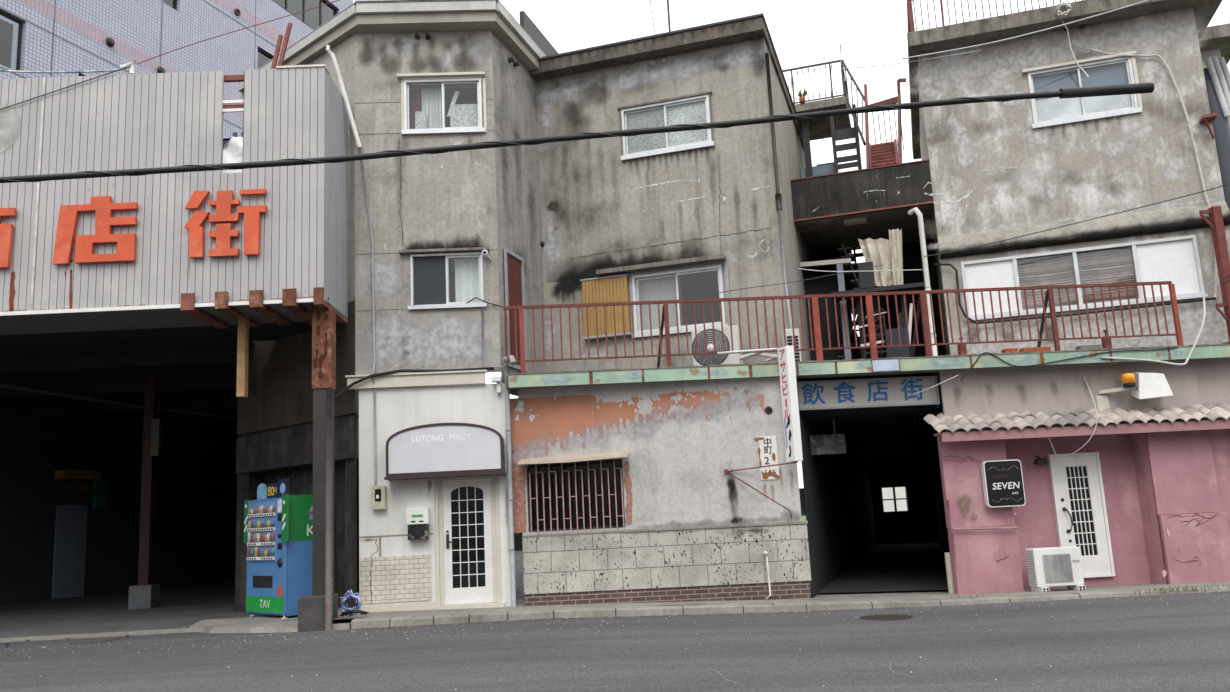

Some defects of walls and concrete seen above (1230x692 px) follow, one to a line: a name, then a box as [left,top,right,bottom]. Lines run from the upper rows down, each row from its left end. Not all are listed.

damp [361,38,479,73]
damp [545,221,560,259]
damp [554,249,703,297]
rust [313,297,329,379]
peeling [510,387,765,533]
damp [728,478,737,502]